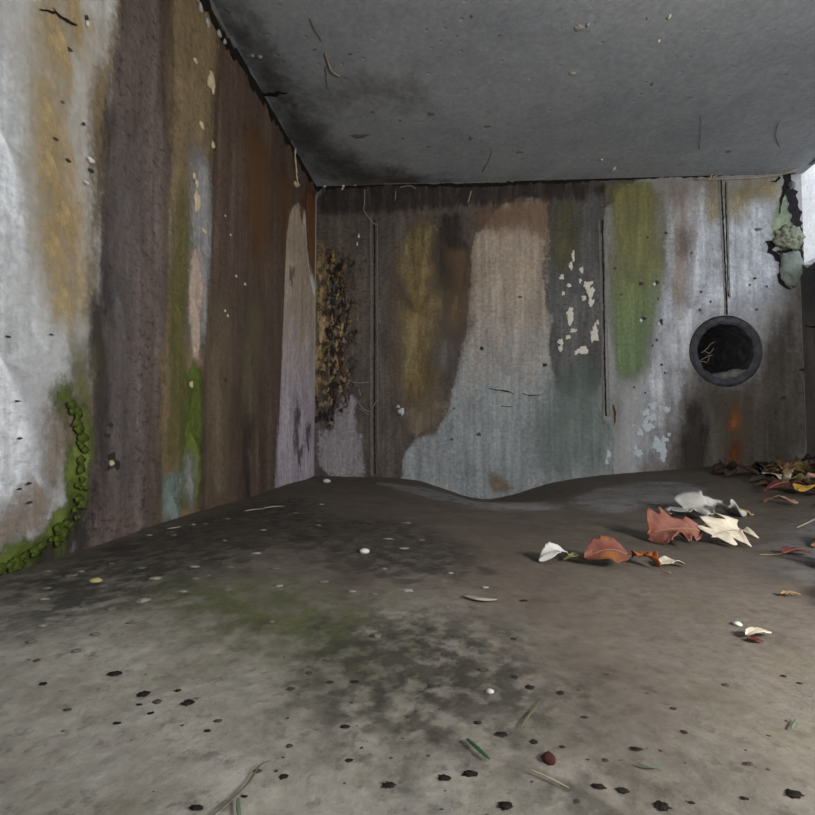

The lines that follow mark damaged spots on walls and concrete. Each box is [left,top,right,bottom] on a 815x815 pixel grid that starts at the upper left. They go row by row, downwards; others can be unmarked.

crack [40,7,77,26]
crack [200,0,734,196]
water stain [0,59,71,550]
water stain [197,0,637,511]
peeling [401,198,614,499]
water stain [570,482,707,514]
peeling [633,402,671,463]
water stain [643,187,806,471]
crack [755,173,804,260]